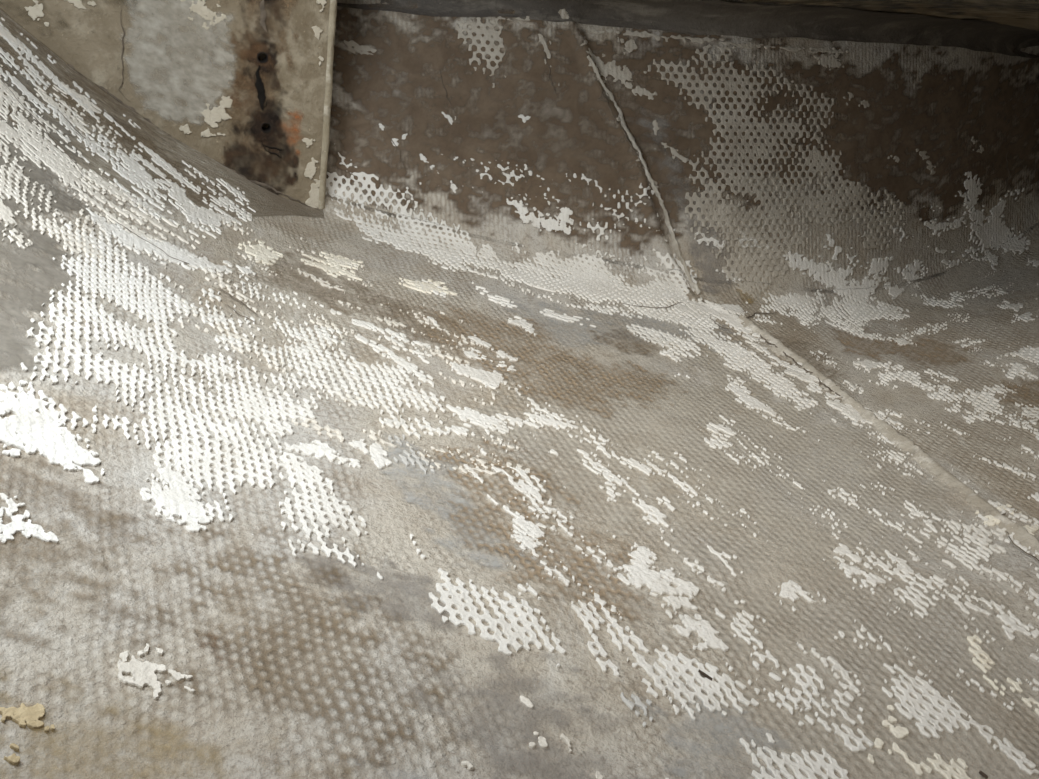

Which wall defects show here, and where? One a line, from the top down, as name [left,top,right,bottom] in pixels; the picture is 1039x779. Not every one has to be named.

corrosion [224,34,300,195]
leakage [327,4,1039,251]
peeling [0,0,676,568]
peeling [704,422,737,450]
crack [710,312,843,398]
peeling [853,345,1039,448]
peeling [117,643,195,700]
peeling [428,568,566,656]
peeling [571,545,971,779]
peeling [833,500,1039,641]
peeling [966,634,1039,716]
crack [1006,531,1039,561]